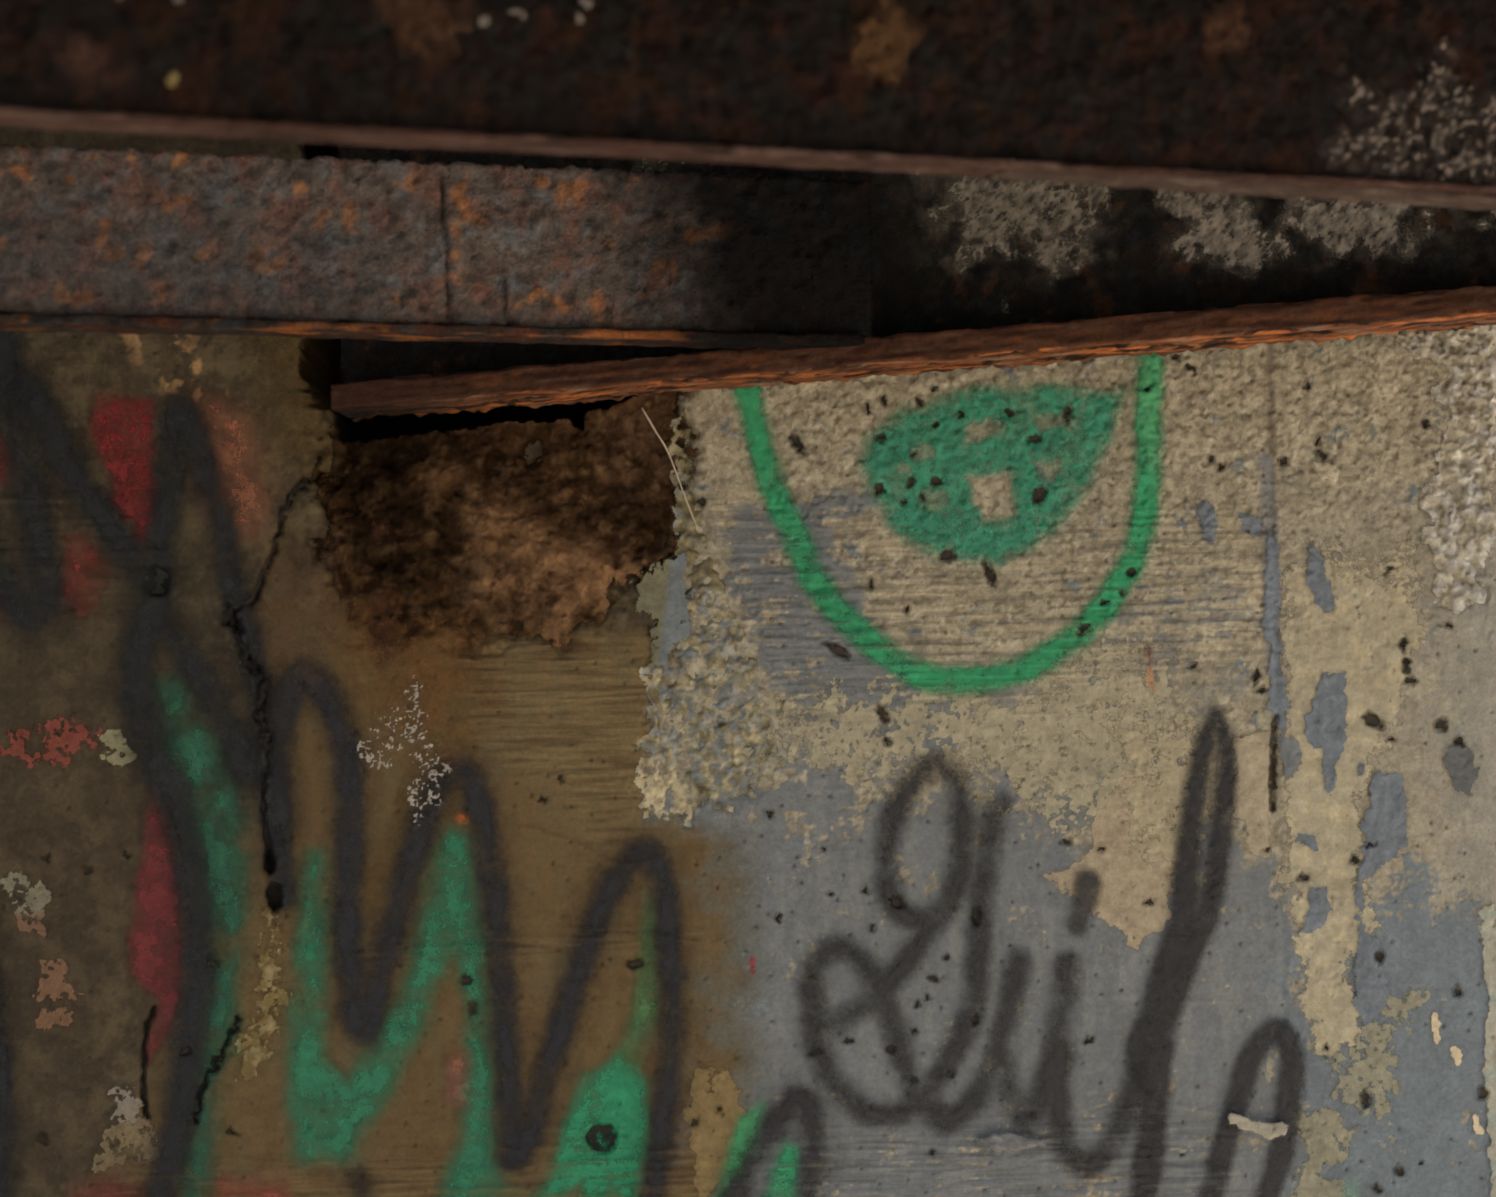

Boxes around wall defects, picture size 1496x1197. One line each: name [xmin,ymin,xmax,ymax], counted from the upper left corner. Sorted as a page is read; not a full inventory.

corrosion [847,0,923,85]
corrosion [1202,0,1253,59]
efflorescence [1326,40,1496,184]
leakage [915,173,1110,277]
leakage [1155,190,1431,277]
crack [222,477,316,852]
spalling [307,391,1463,1197]
peeling [1435,719,1480,797]
peeling [1473,902,1496,1197]